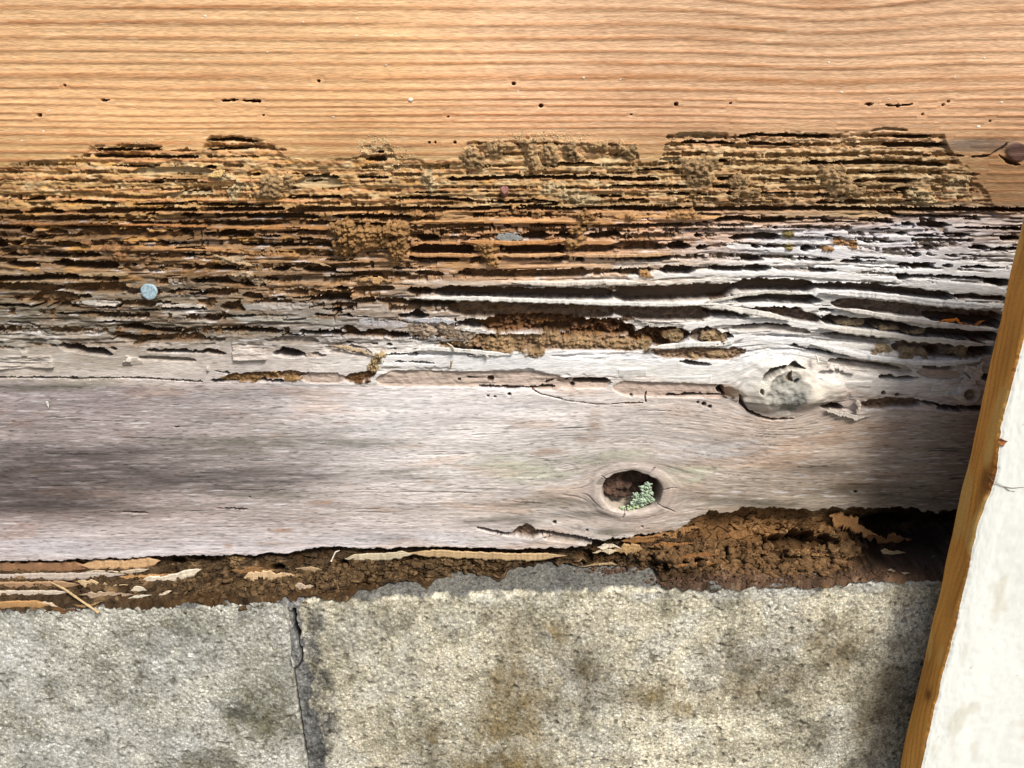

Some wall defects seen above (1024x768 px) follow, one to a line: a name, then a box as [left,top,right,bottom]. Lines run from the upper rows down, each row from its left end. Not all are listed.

crack [292,607,310,768]